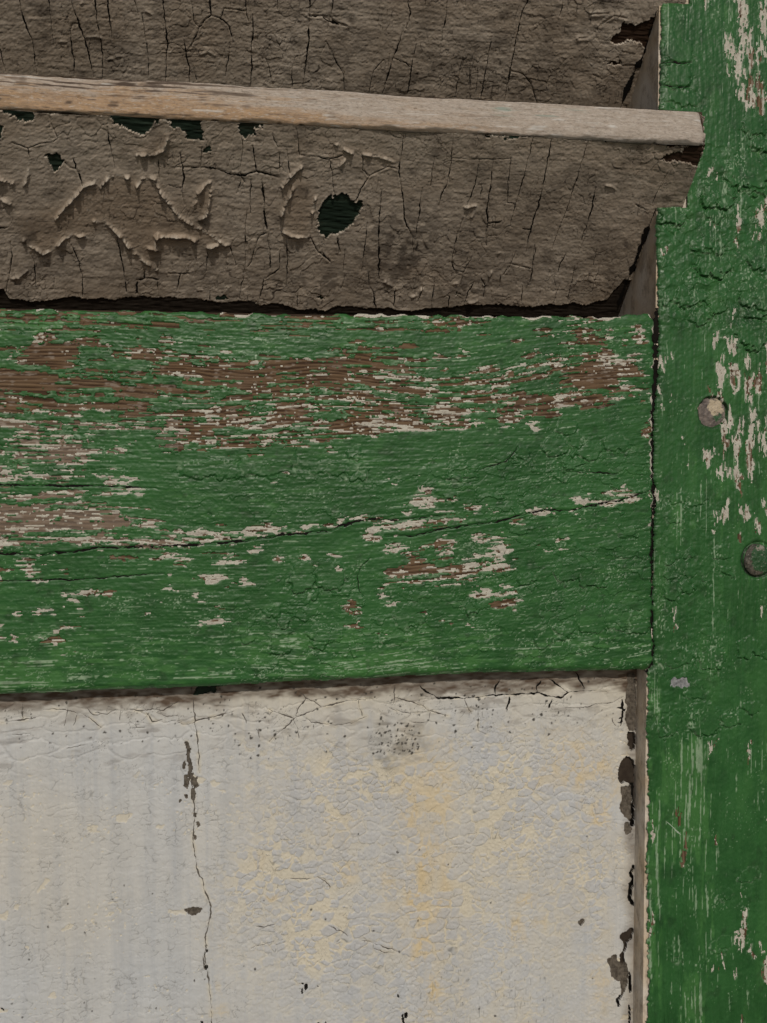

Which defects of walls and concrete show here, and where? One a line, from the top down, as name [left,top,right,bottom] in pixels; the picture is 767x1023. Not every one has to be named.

crack [19,0,112,76]
crack [134,0,344,85]
crack [369,0,466,93]
peeling [724,0,767,116]
peeling [317,193,363,239]
crack [618,173,668,308]
crack [0,308,660,673]
peeling [0,279,673,611]
peeling [702,308,767,543]
peeling [618,672,636,835]
crack [1,672,626,1023]
peeling [607,928,634,1023]